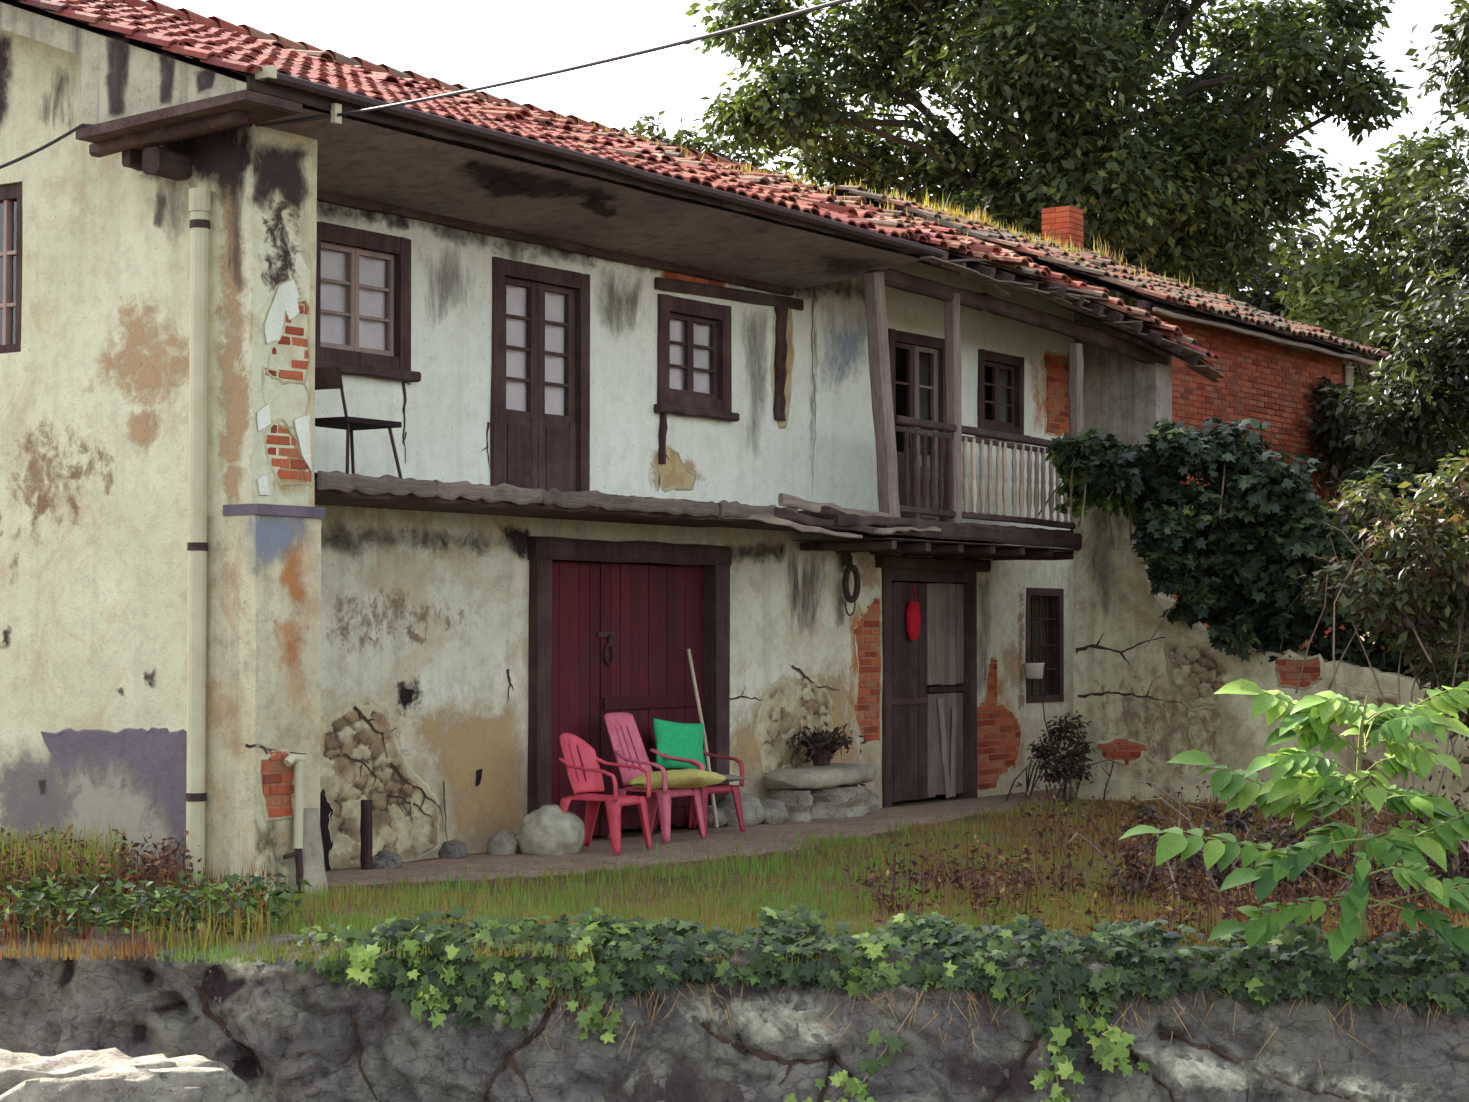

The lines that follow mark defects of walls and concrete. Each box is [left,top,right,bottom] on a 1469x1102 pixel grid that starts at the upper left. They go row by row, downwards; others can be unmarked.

damp [0,37,11,122]
damp [143,128,589,288]
damp [463,161,616,217]
flaking render [249,279,314,496]
flaking render [1043,350,1070,438]
flaking render [658,445,697,493]
flaking render [818,597,882,763]
flaking render [977,593,1025,791]
crack [1075,634,1206,709]
flaking render [256,748,294,823]
flaking render [1095,735,1149,764]